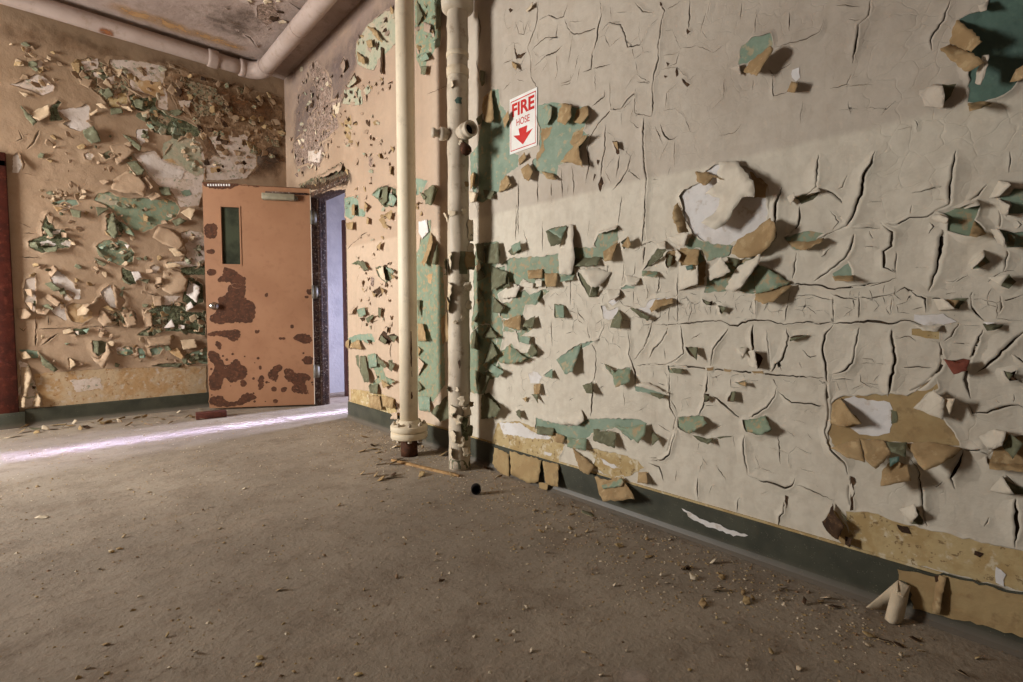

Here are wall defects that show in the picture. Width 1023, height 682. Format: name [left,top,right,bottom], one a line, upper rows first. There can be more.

peeling [241,0,287,31]
peeling [414,0,444,77]
peeling [919,0,1023,111]
peeling [3,5,399,420]
rust [204,223,218,254]
rust [207,267,313,407]
peeling [416,64,829,501]
crack [476,0,1023,548]
peeling [824,352,1023,501]
peeling [818,500,1023,639]